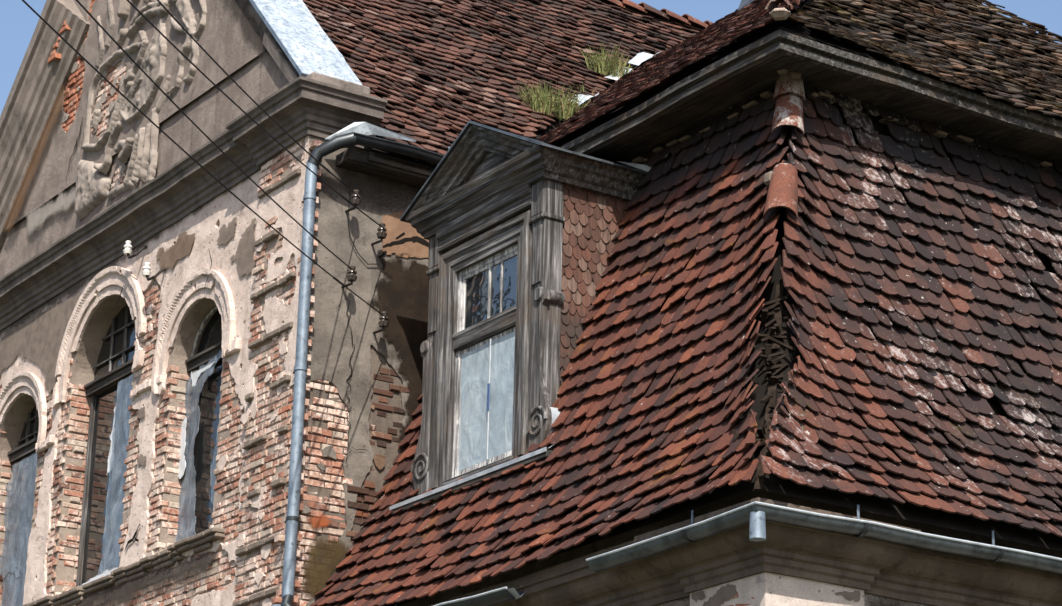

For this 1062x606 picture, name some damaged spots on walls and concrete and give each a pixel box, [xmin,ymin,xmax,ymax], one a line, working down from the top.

flaking render [48,20,71,64]
flaking render [62,56,85,132]
flaking render [91,55,127,137]
flaking render [257,138,322,193]
flaking render [77,160,410,606]
crack [336,283,370,477]
leakage [370,254,430,444]
peeling [0,291,81,593]
peeling [831,590,861,602]